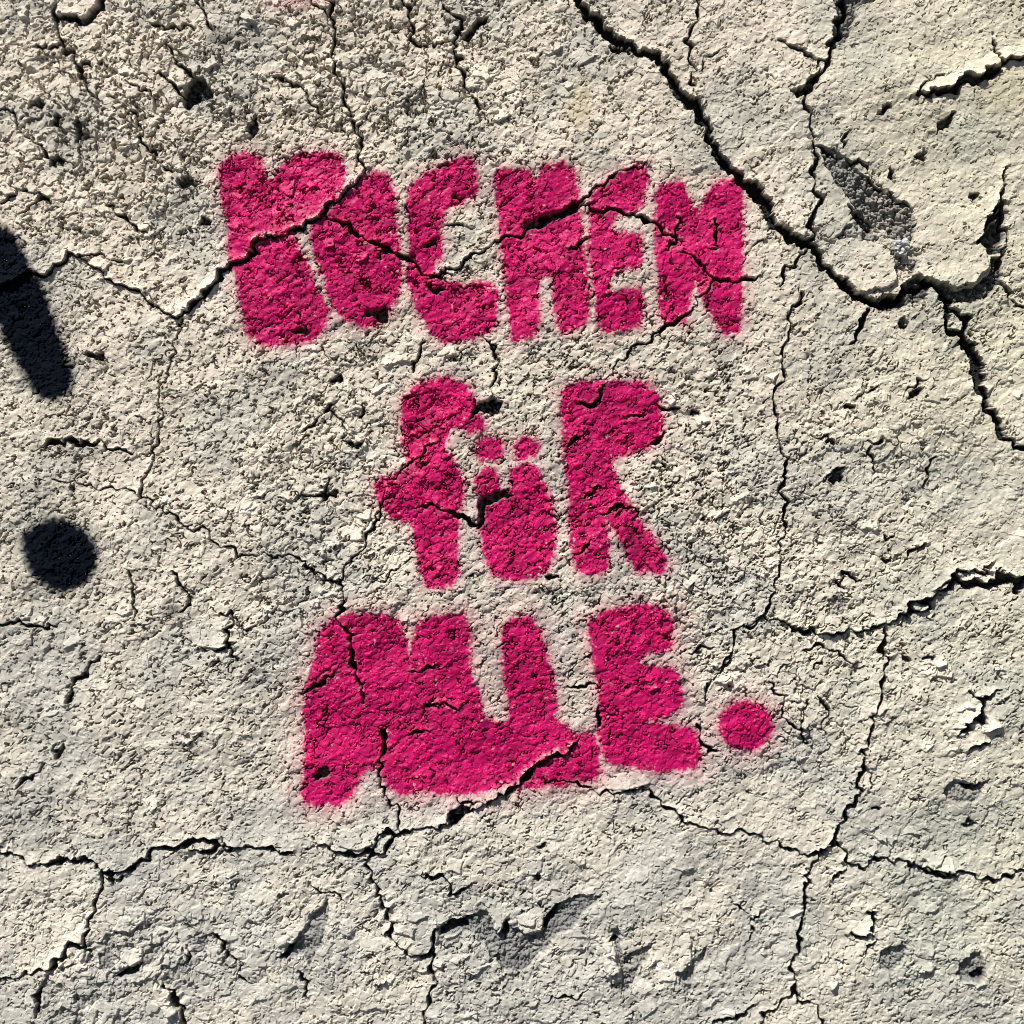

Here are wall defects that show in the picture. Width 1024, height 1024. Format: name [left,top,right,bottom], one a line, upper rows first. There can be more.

spalling [820,131,1006,330]
crack [0,0,1024,705]
crack [316,291,1024,1024]
crack [0,837,294,985]
crack [309,882,346,904]
crack [160,984,187,1024]
crack [298,970,310,1001]